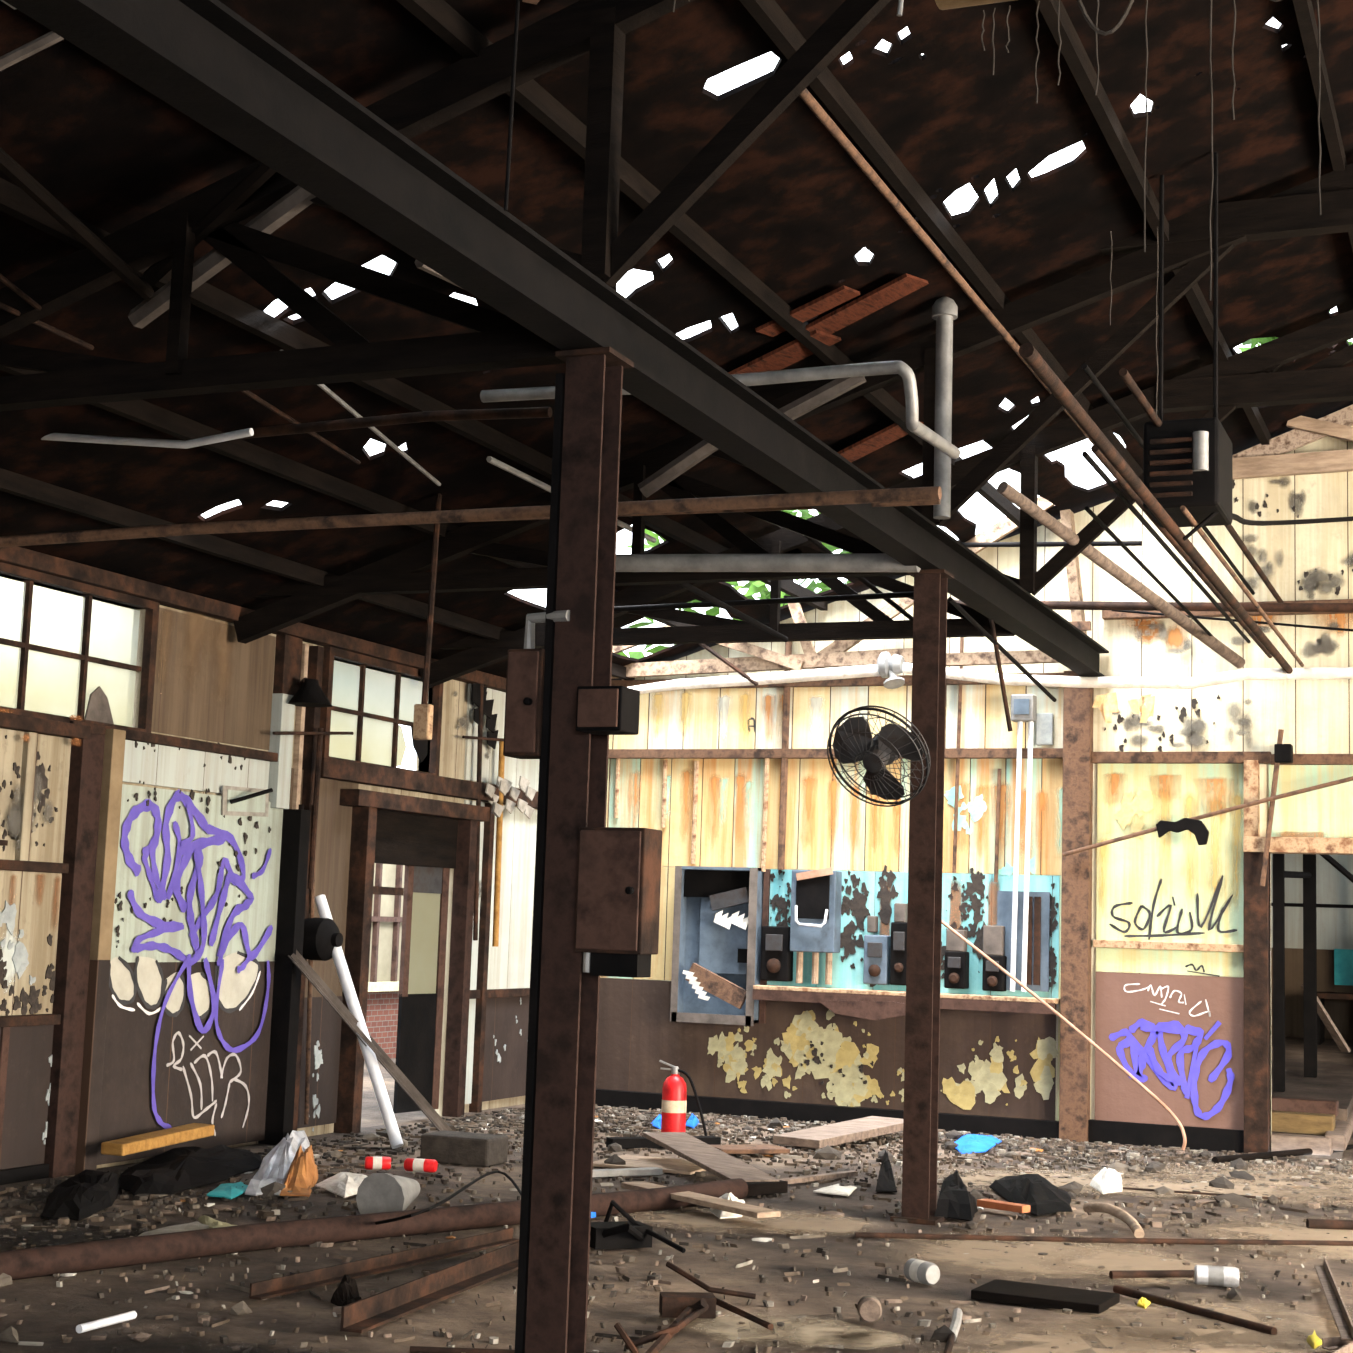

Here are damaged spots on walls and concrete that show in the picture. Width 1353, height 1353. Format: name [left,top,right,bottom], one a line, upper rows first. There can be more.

water stain [1270,478,1306,514]
water stain [1304,623,1339,656]
water stain [1112,711,1164,745]
water stain [1229,699,1251,745]
corrosion [736,776,744,811]
corrosion [829,780,878,845]
corrosion [1109,773,1122,795]
corrosion [1187,778,1240,888]
peeling [770,870,791,927]
peeling [840,865,899,969]
peeling [0,900,56,1016]
peeling [708,1010,904,1107]